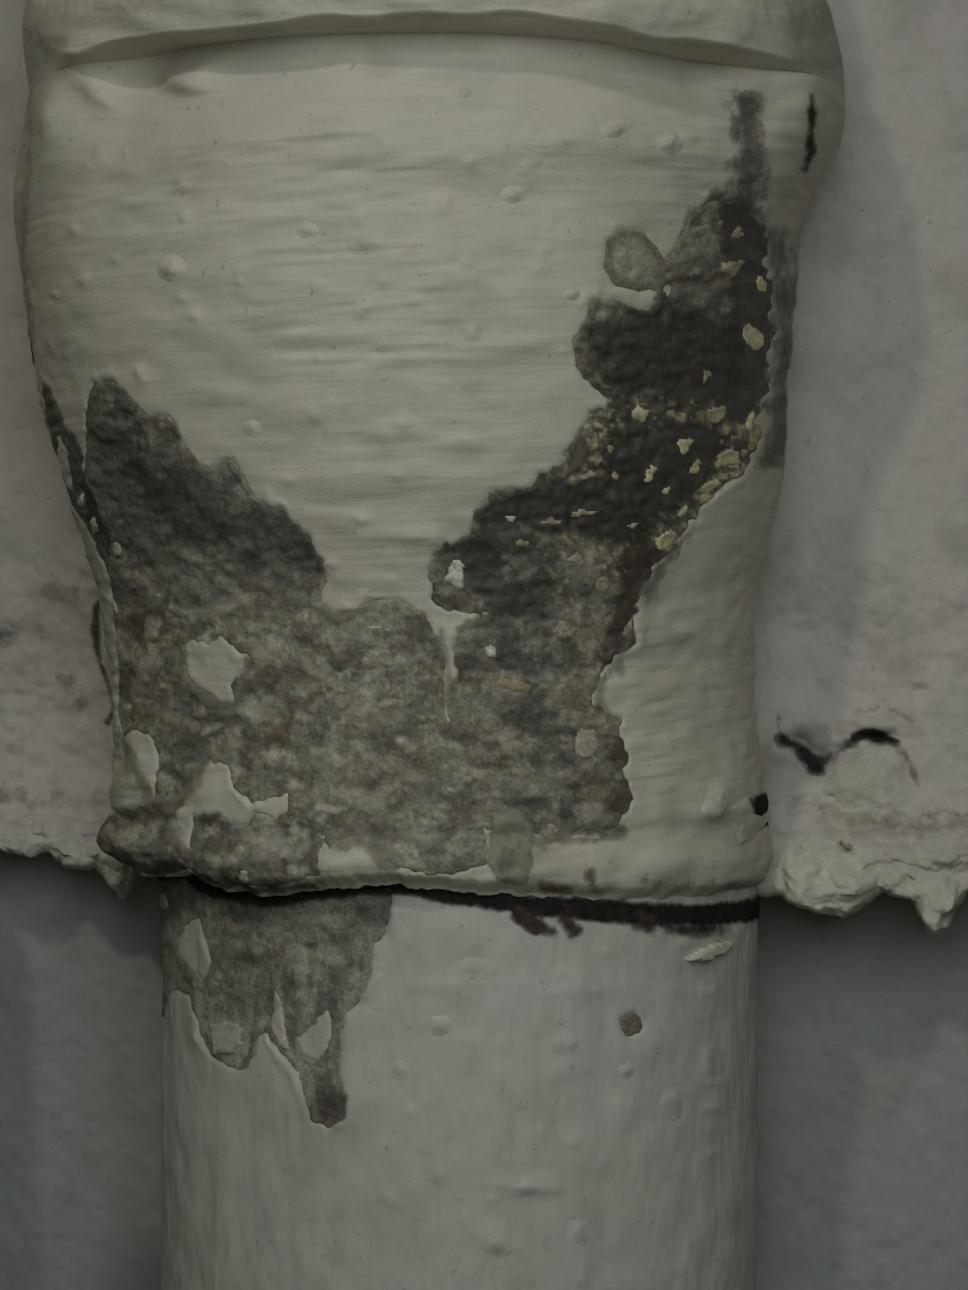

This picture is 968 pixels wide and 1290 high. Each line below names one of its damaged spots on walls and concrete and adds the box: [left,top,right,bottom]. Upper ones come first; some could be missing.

crack [805,94,817,172]
crack [91,599,113,724]
peeling [0,200,791,1128]
crack [775,729,898,775]
crack [751,793,769,827]
crack [158,873,760,937]